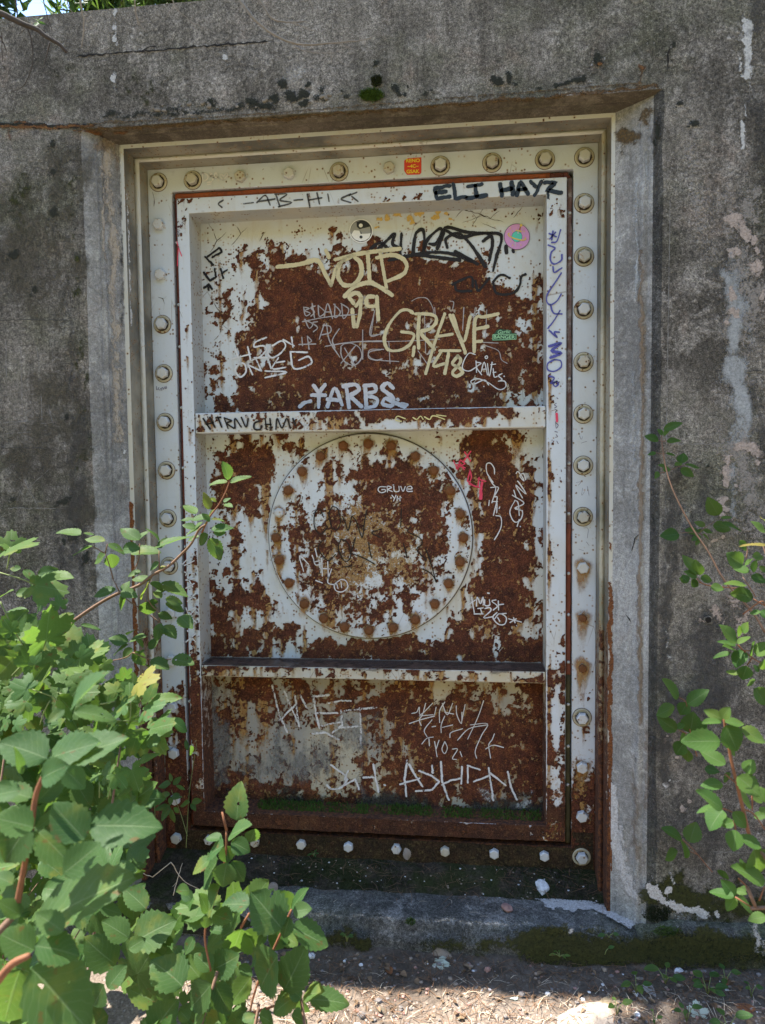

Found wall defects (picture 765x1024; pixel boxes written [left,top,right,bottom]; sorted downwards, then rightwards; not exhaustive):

crack [76,40,268,57]
water stain [739,0,765,80]
water stain [740,98,765,160]
rust [164,226,614,871]
water stain [606,465,751,920]
water stain [688,183,765,597]